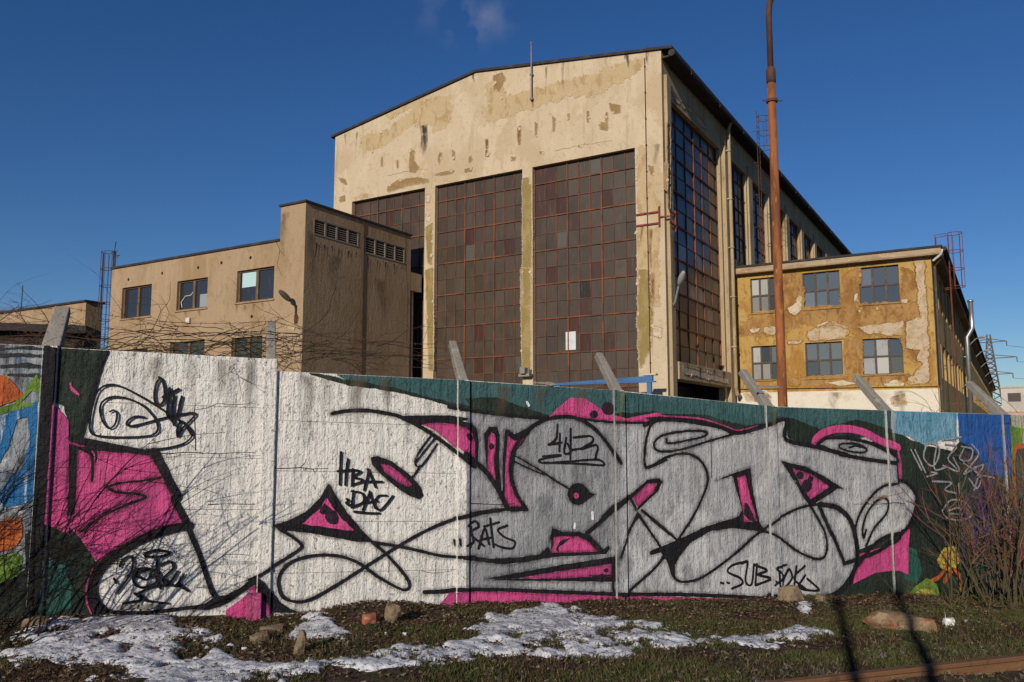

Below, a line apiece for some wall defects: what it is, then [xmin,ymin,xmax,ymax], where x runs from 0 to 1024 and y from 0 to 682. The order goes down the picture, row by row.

peeling [481,57,644,161]
peeling [359,94,473,371]
peeling [737,257,931,407]